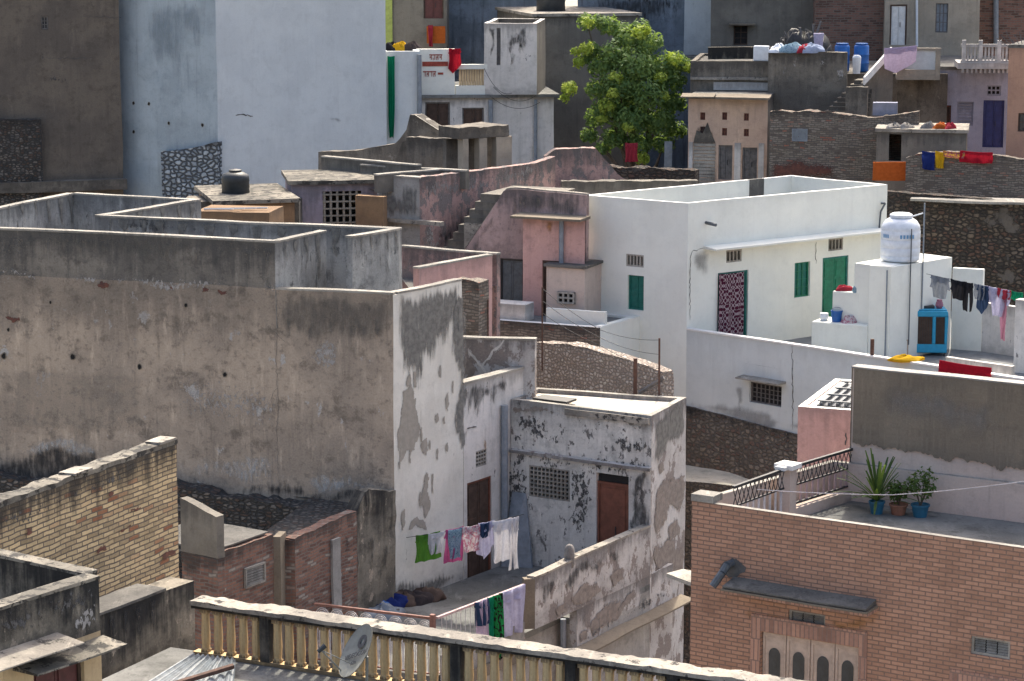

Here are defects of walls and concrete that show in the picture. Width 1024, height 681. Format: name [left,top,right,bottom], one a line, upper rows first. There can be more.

peeling [397,371,448,469]
peeling [435,358,478,427]
damp [0,440,95,477]
peeling [401,473,434,530]
peeling [654,462,685,571]
peeling [556,567,625,617]
peeling [580,591,636,642]